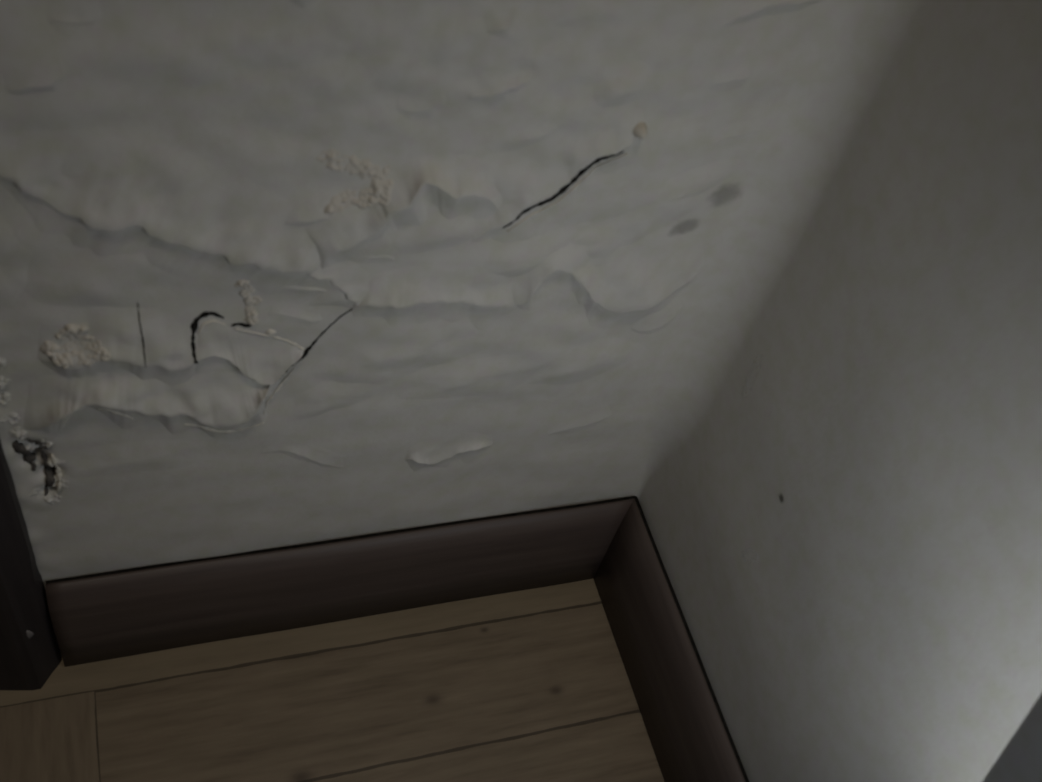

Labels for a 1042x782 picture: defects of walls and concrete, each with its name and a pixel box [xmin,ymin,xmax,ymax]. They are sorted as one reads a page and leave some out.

peeling [471,106,643,243]
crack [503,151,628,232]
peeling [0,306,306,504]
crack [191,311,252,364]
crack [264,309,352,412]